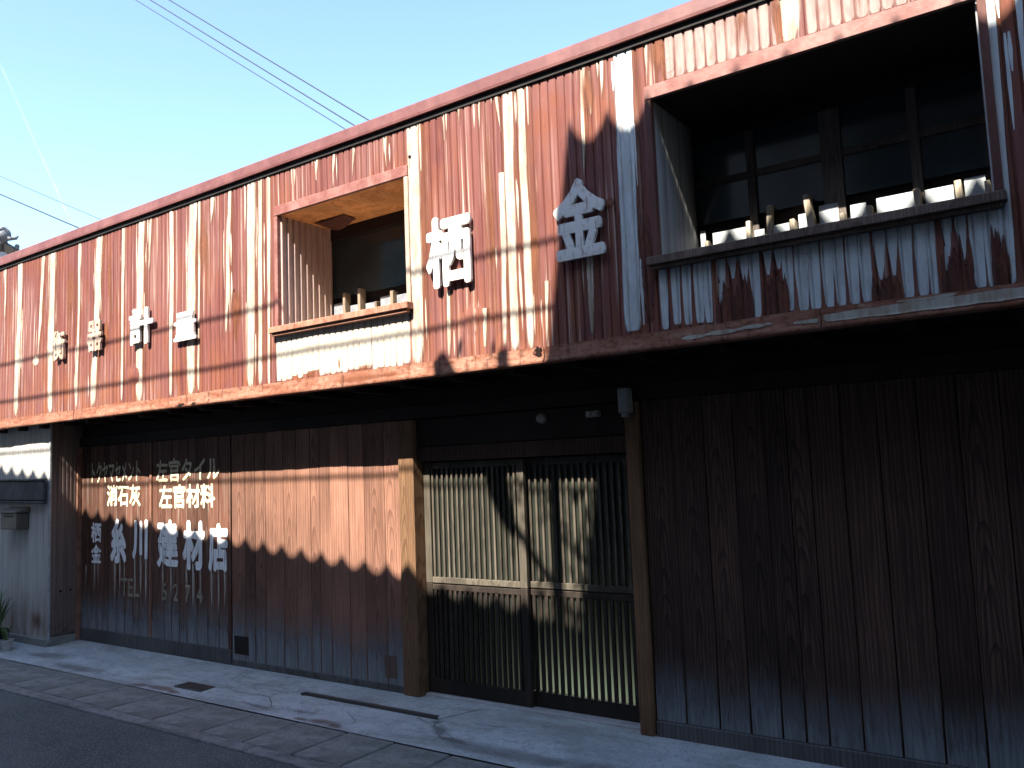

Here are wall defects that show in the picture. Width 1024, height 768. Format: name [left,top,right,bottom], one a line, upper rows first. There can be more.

rust [771,0,783,45]
rust [652,38,665,83]
rust [582,68,593,140]
peeling [659,0,1024,340]
rust [485,174,497,326]
rust [640,219,655,321]
rust [232,293,240,331]